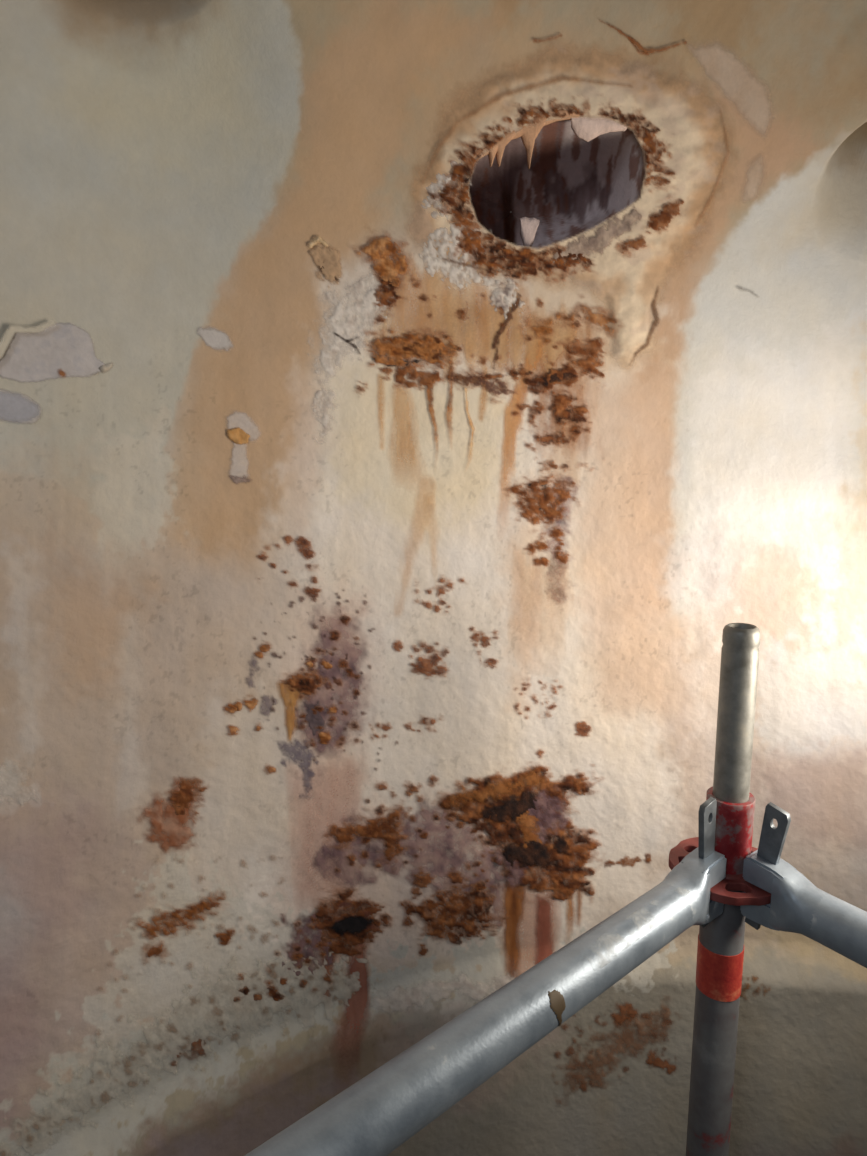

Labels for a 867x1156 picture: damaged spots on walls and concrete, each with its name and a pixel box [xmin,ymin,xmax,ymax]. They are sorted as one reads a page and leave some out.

crack [607,24,687,55]
peeling [571,116,627,142]
peeling [520,217,539,248]
corrosion [357,236,408,310]
peeling [0,321,113,423]
peeling [198,328,233,351]
corrosion [370,330,474,454]
corrosion [524,305,617,446]
peeling [227,412,260,484]
corrosion [507,461,575,602]
corrosion [393,641,449,676]
corrosion [316,750,651,978]